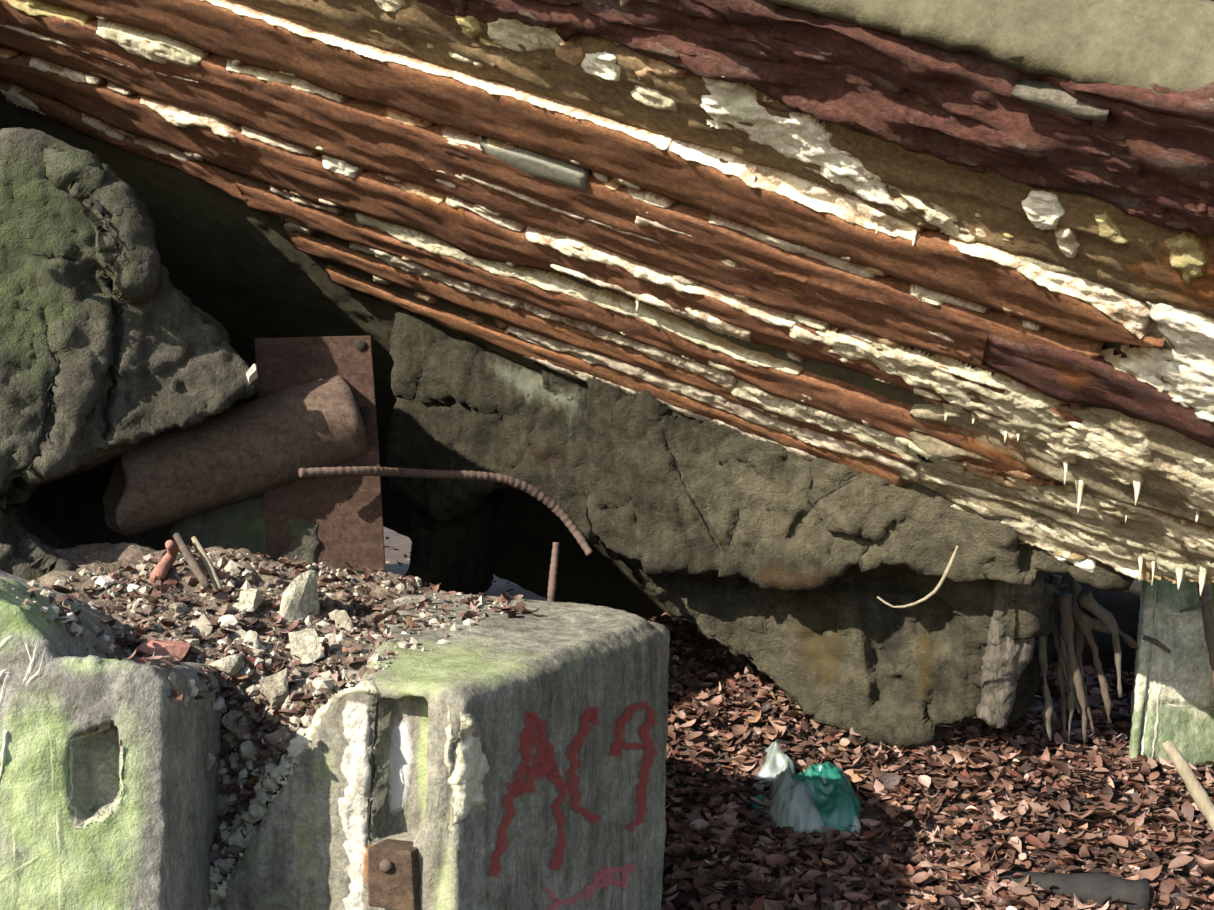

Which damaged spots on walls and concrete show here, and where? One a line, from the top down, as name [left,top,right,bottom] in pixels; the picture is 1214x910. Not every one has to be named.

peeling [427,38,512,69]
damp [102,122,190,162]
damp [139,95,363,178]
peeling [462,0,1214,236]
crack [104,293,122,432]
spalling [246,364,258,385]
damp [349,181,1214,596]
peeling [794,314,901,348]
peeling [909,283,944,306]
spalling [298,466,593,556]
spalling [547,542,560,602]
crack [367,697,378,844]